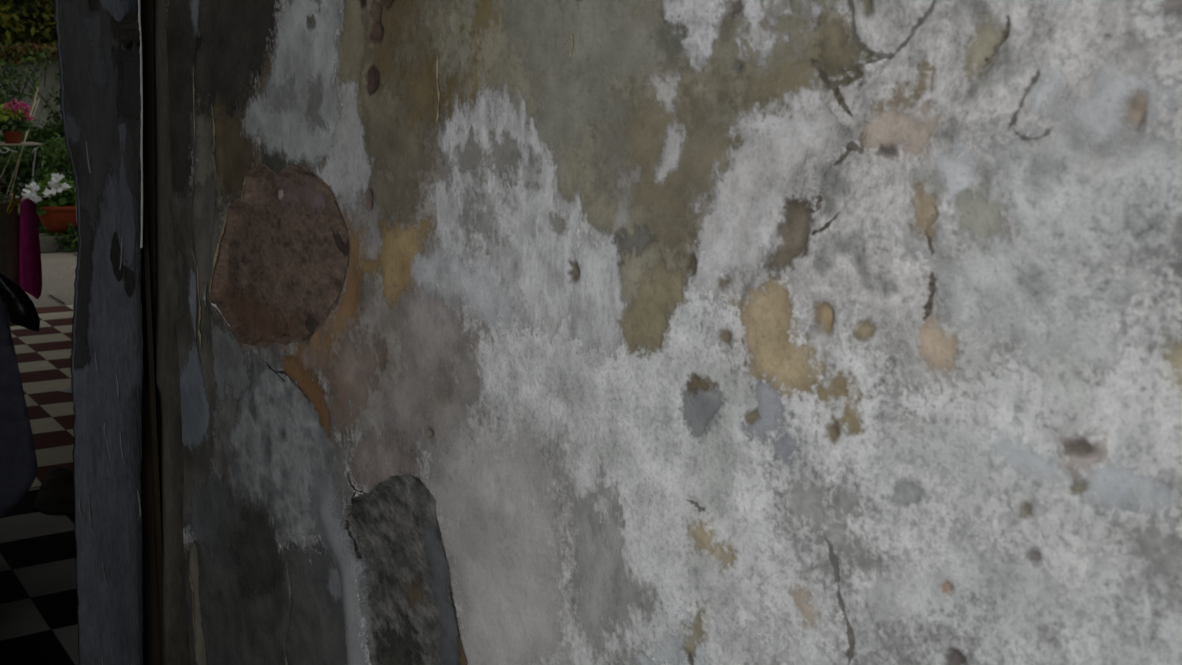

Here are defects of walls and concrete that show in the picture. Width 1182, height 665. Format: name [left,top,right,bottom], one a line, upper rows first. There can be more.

damp [316,79,374,212]
crack [810,0,935,165]
flaking render [766,198,812,278]
crack [792,191,840,235]
flaking render [191,0,461,665]
crack [823,533,855,665]